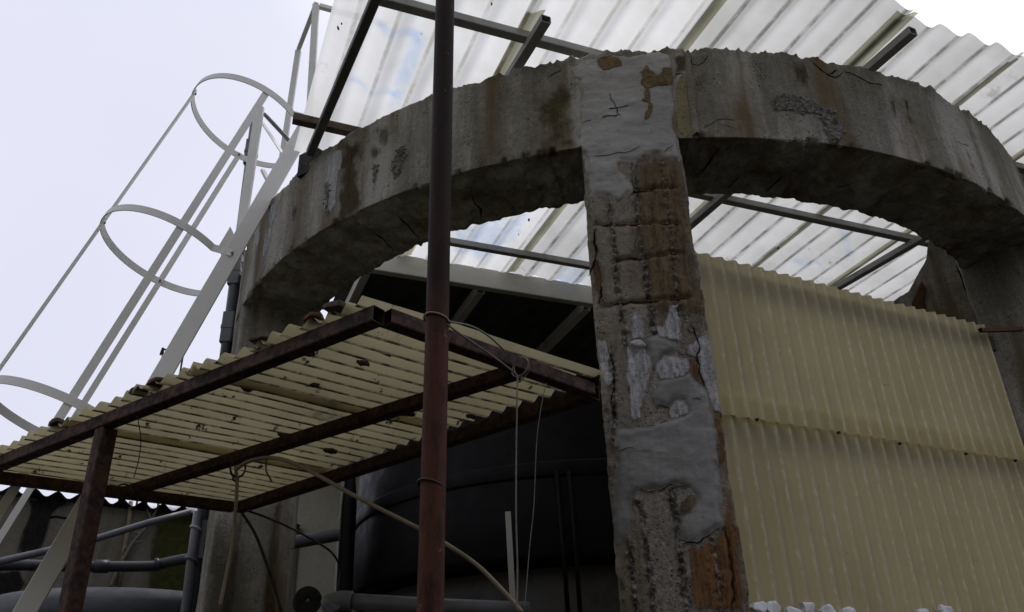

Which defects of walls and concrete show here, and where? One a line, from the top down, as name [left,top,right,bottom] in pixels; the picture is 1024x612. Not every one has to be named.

crack [812,61,881,85]
spalling [774,92,846,148]
peeling [598,340,614,397]
peeling [623,305,721,419]
crack [679,327,705,400]
corrosion [690,489,743,608]